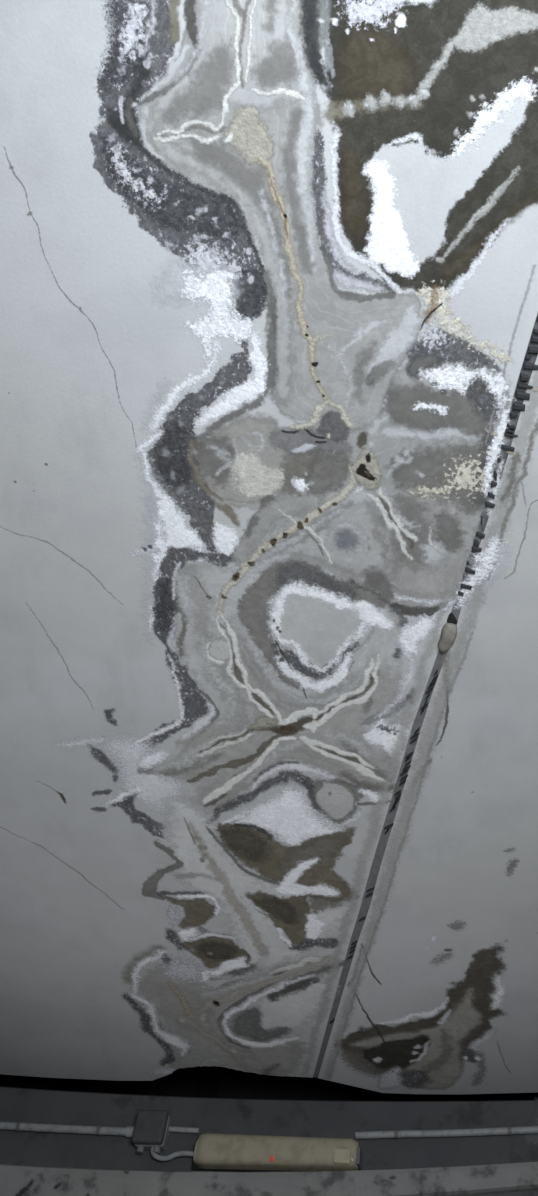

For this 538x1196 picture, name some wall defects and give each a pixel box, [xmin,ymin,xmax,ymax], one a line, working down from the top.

crack [4,147,134,431]
peeling [415,280,514,365]
spalling [351,450,382,495]
peeling [409,454,490,504]
crack [0,526,122,604]
crack [153,0,449,1066]
damp [89,0,538,1090]
crack [29,607,92,706]
crack [0,826,123,909]